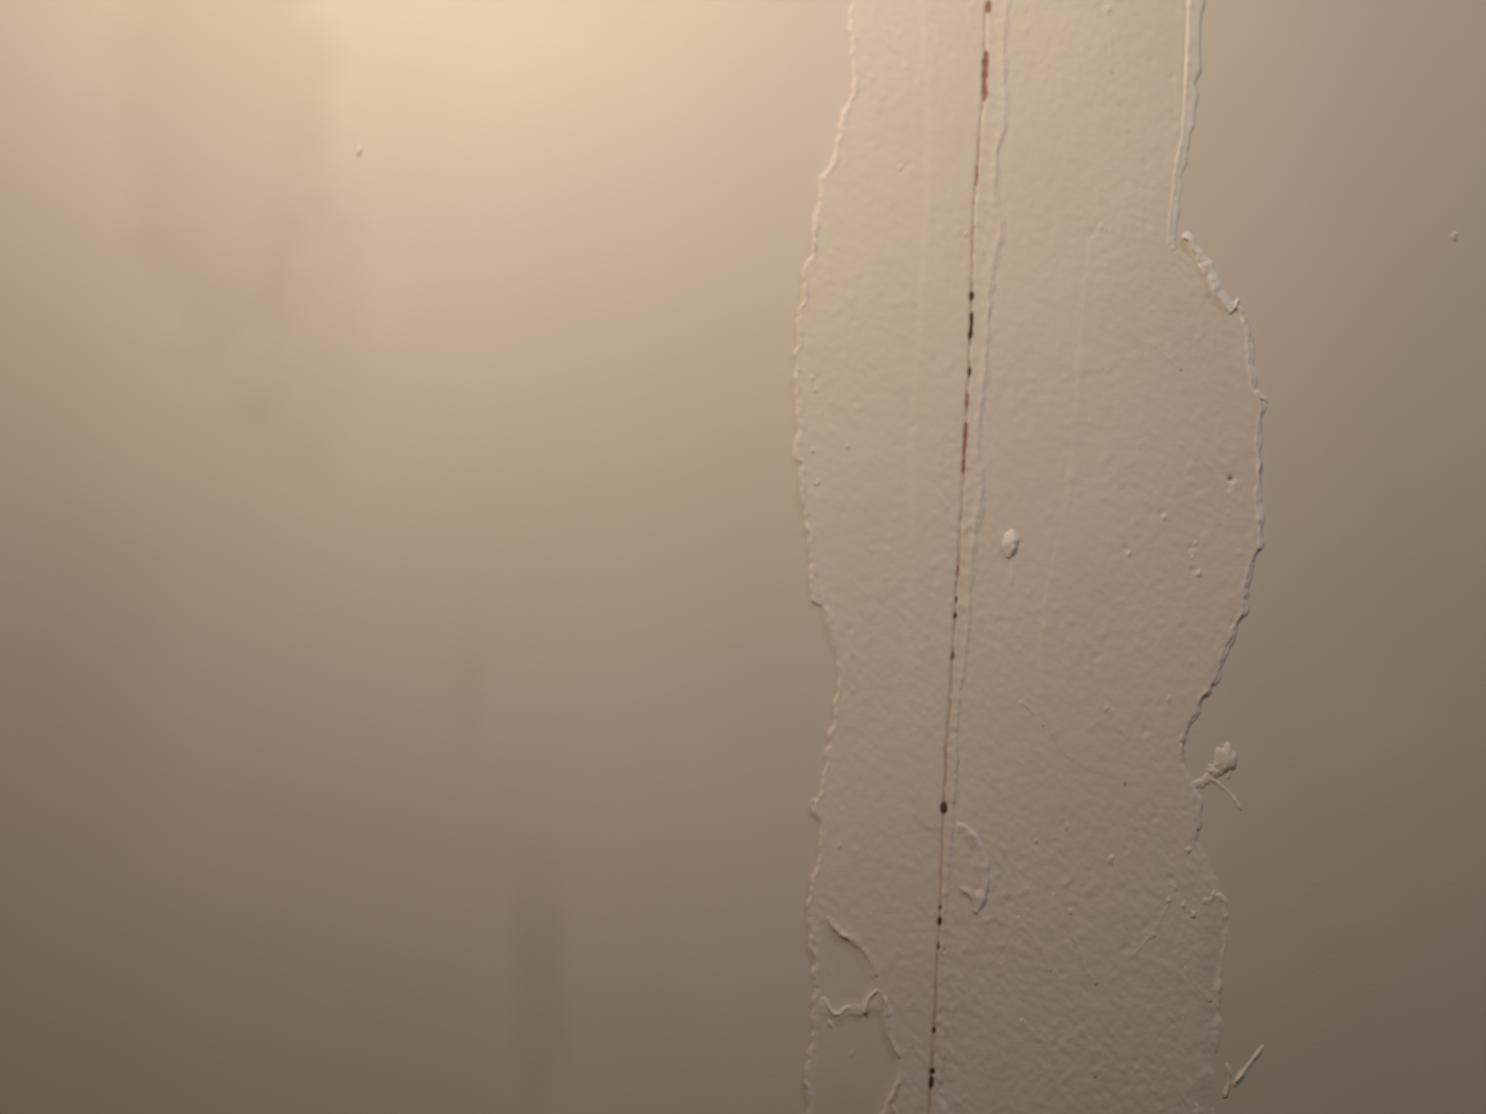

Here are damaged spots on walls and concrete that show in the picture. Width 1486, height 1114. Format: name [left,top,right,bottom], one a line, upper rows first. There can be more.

flaking render [1167,0,1251,336]
crack [928,0,987,1114]
flaking render [1178,742,1242,830]